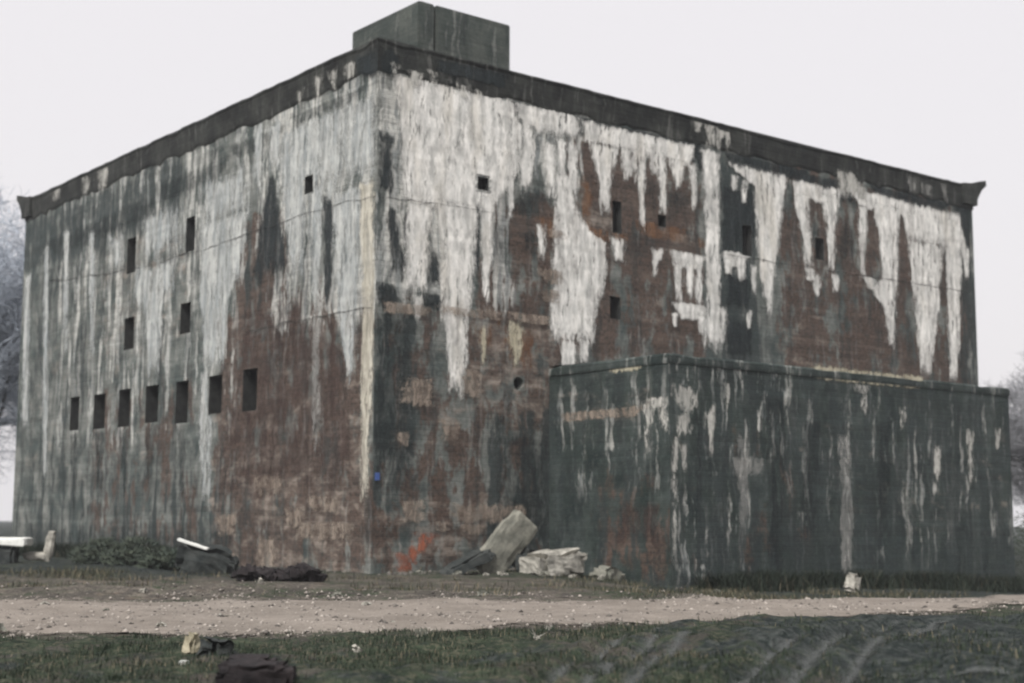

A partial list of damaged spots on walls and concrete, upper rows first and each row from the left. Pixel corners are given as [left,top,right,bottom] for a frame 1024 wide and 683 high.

leakage [22,275,31,427]
corrosion [223,302,350,491]
leakage [42,48,971,506]
leakage [643,383,730,555]
leakage [966,430,974,488]